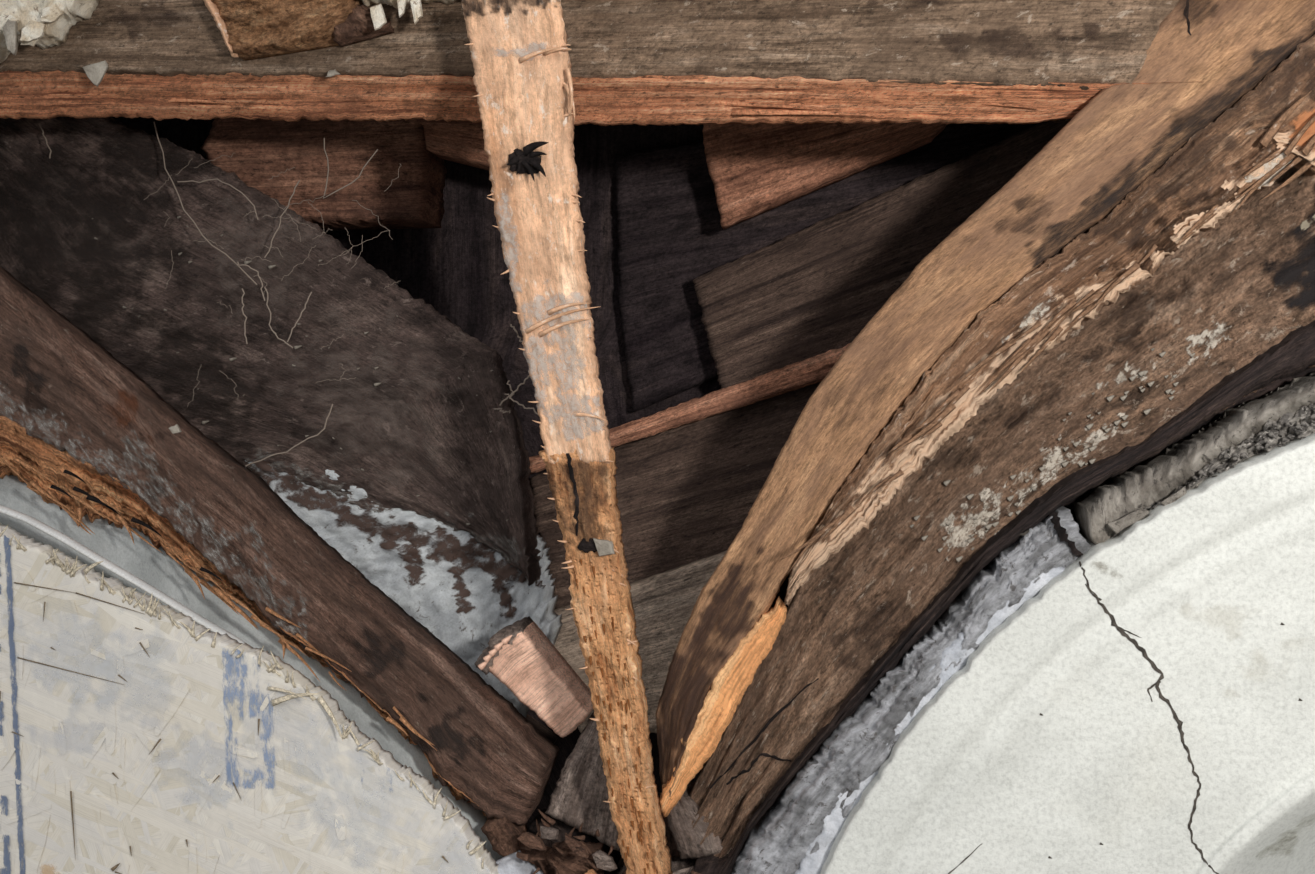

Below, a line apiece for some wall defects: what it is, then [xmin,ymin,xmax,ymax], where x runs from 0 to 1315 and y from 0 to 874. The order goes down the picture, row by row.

crack [1019,512,1219,874]